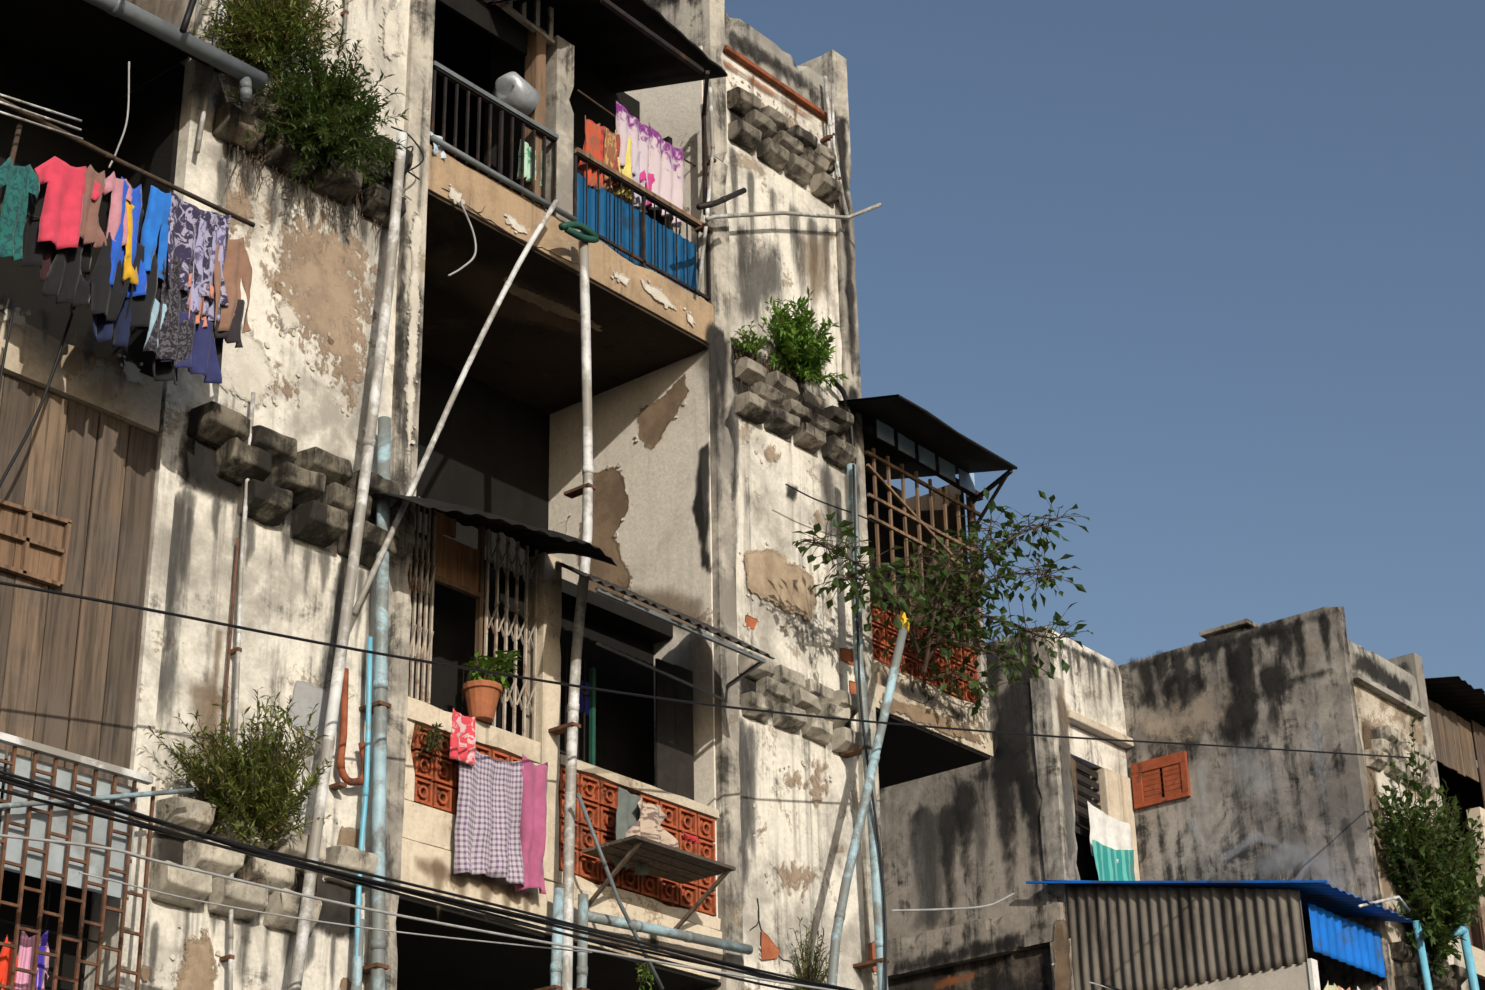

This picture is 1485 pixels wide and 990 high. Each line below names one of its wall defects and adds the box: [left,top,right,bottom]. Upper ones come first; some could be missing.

peeling [217,168,381,432]
peeling [611,270,695,327]
water stain [730,117,856,363]
peeling [634,373,689,449]
water stain [158,437,254,716]
water stain [283,507,372,691]
peeling [553,463,633,603]
peeling [739,541,821,630]
water stain [911,634,1041,923]
water stain [1058,612,1330,857]
water stain [1364,720,1391,896]
peeling [169,925,221,990]